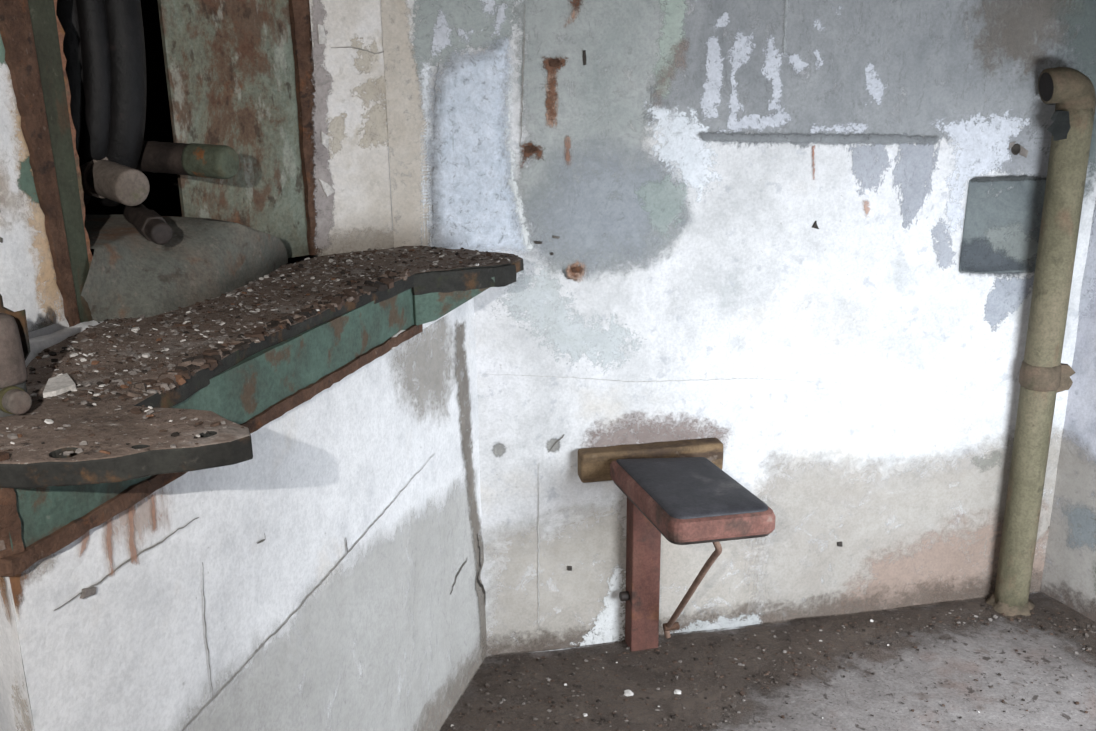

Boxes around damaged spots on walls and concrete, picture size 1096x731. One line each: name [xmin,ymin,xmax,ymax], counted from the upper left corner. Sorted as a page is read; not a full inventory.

corrosion [542,57,567,127]
corrosion [15,110,33,176]
corrosion [520,141,544,168]
peeling [411,0,1095,369]
corrosion [27,193,62,322]
corrosion [567,262,585,280]
corrosion [80,530,90,556]
corrosion [106,495,162,575]
water stain [659,438,1014,634]
corrosion [0,554,54,620]
water stain [486,508,627,655]